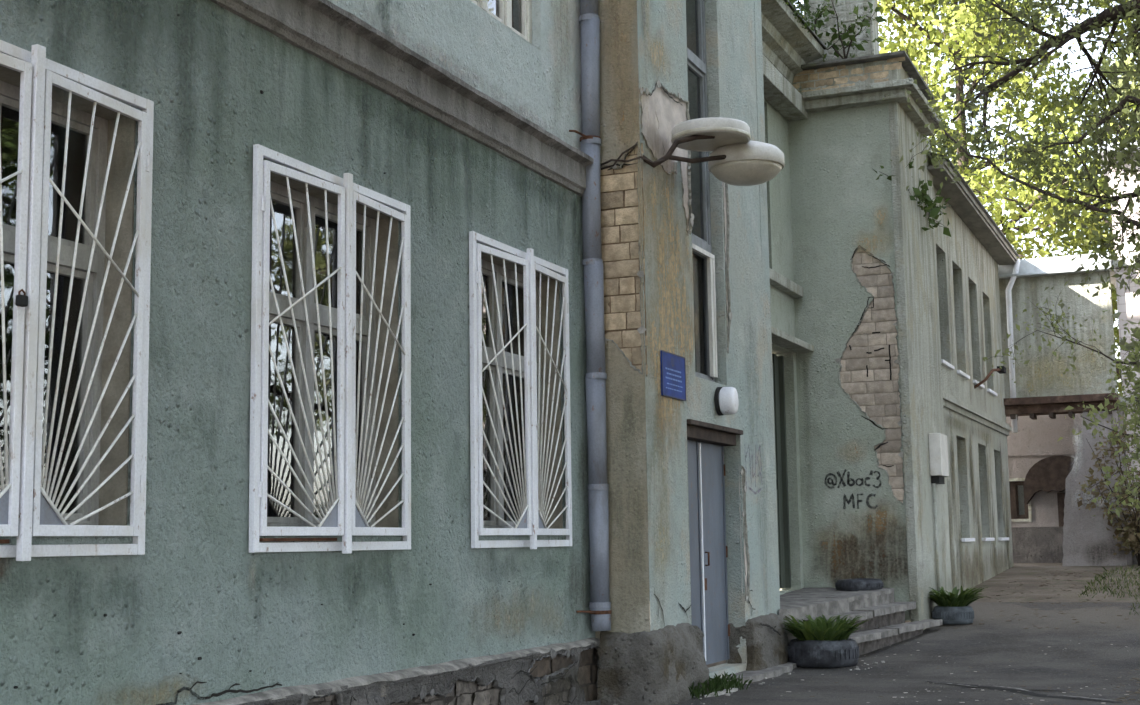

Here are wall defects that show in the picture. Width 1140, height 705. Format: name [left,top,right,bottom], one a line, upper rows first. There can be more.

spalling [600,75,694,377]
spalling [835,247,905,505]
leakage [831,534,908,581]
crack [156,681,294,705]
crack [509,661,578,705]